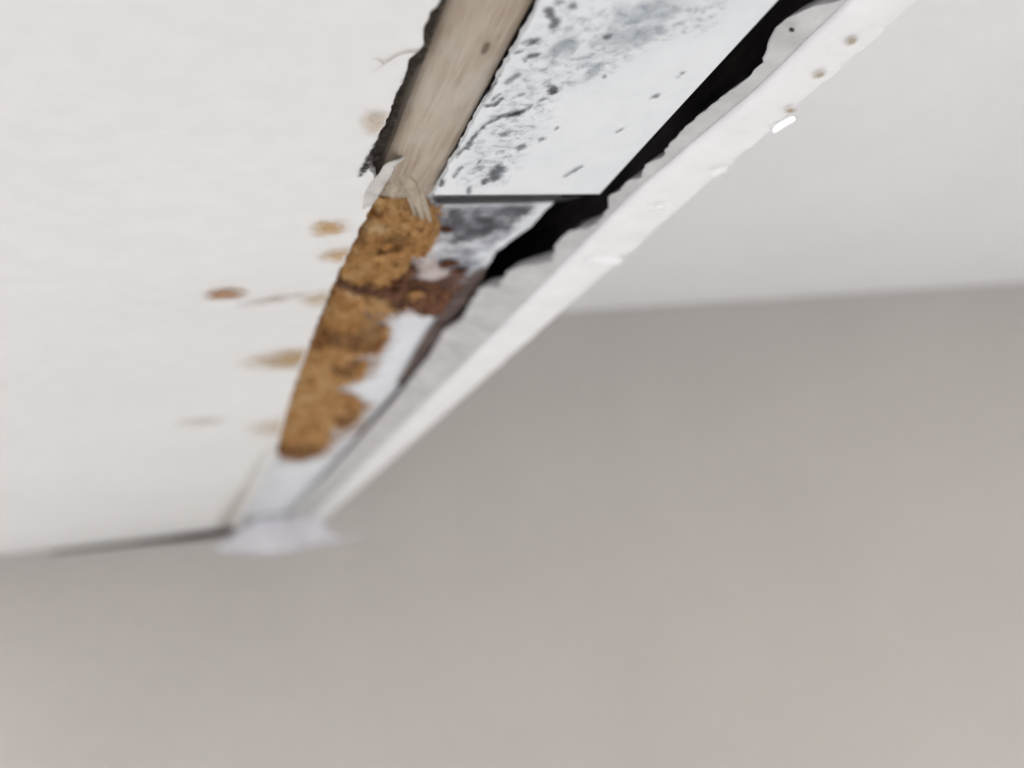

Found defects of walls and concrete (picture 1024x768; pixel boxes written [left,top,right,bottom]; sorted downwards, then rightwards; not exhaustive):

rust [210,291,241,299]
rust [268,351,304,366]
rust [317,223,341,234]
rust [334,260,485,385]
damp [432,195,585,279]
spalling [289,0,846,518]